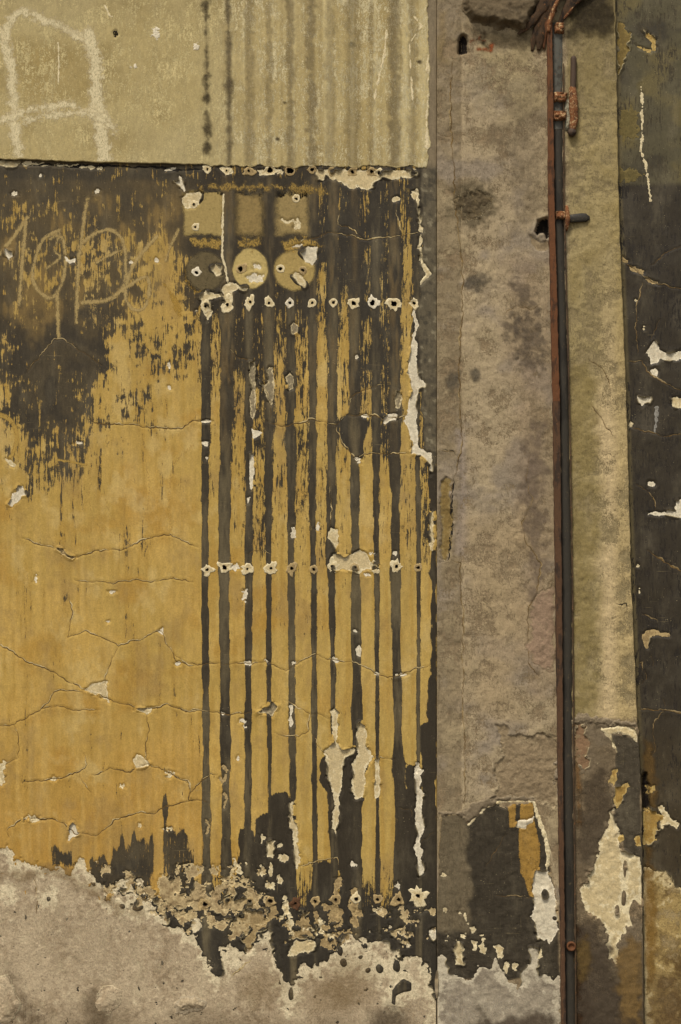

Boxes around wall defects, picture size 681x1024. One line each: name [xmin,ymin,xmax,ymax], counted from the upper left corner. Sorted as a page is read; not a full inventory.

water stain [203,50,211,152]
water stain [225,0,233,164]
peeling [278,244,320,304]
flaking render [310,167,432,285]
peeling [646,339,681,377]
peeling [648,497,681,520]
crack [0,534,428,836]
peeling [601,726,639,755]
water stain [0,846,561,1024]
peeling [95,800,519,974]
spalling [467,725,560,959]
flaking render [580,769,679,964]